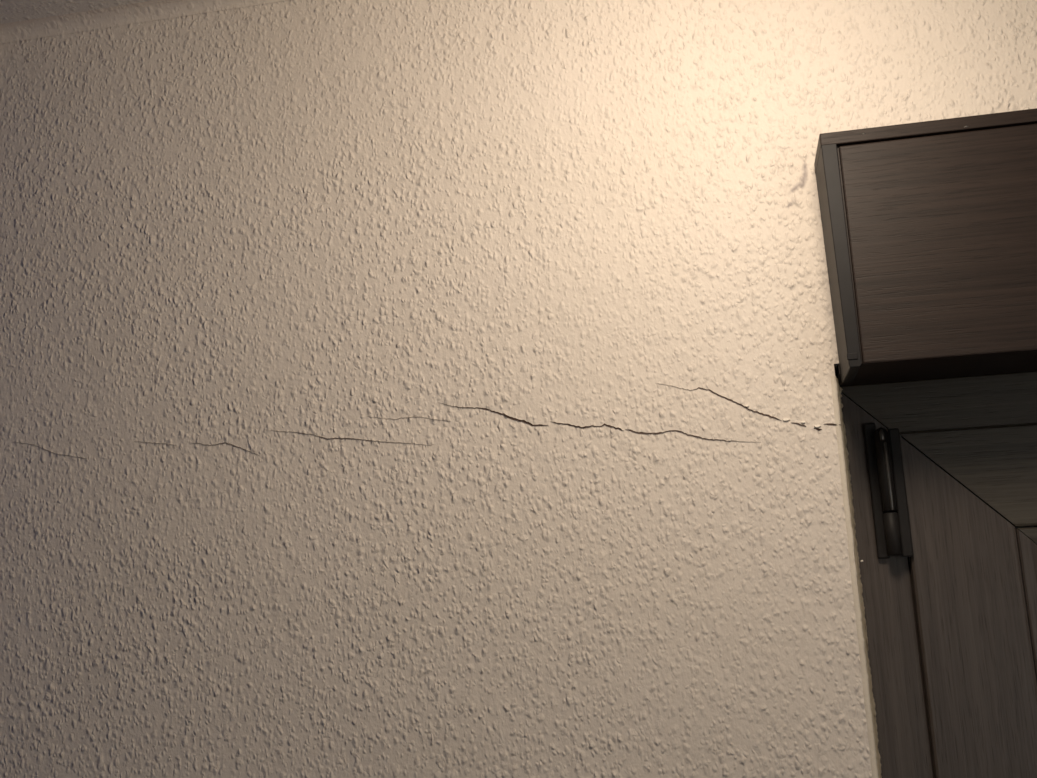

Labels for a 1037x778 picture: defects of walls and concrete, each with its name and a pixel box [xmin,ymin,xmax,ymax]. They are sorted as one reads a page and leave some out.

crack [273,403,744,445]
crack [657,383,840,430]